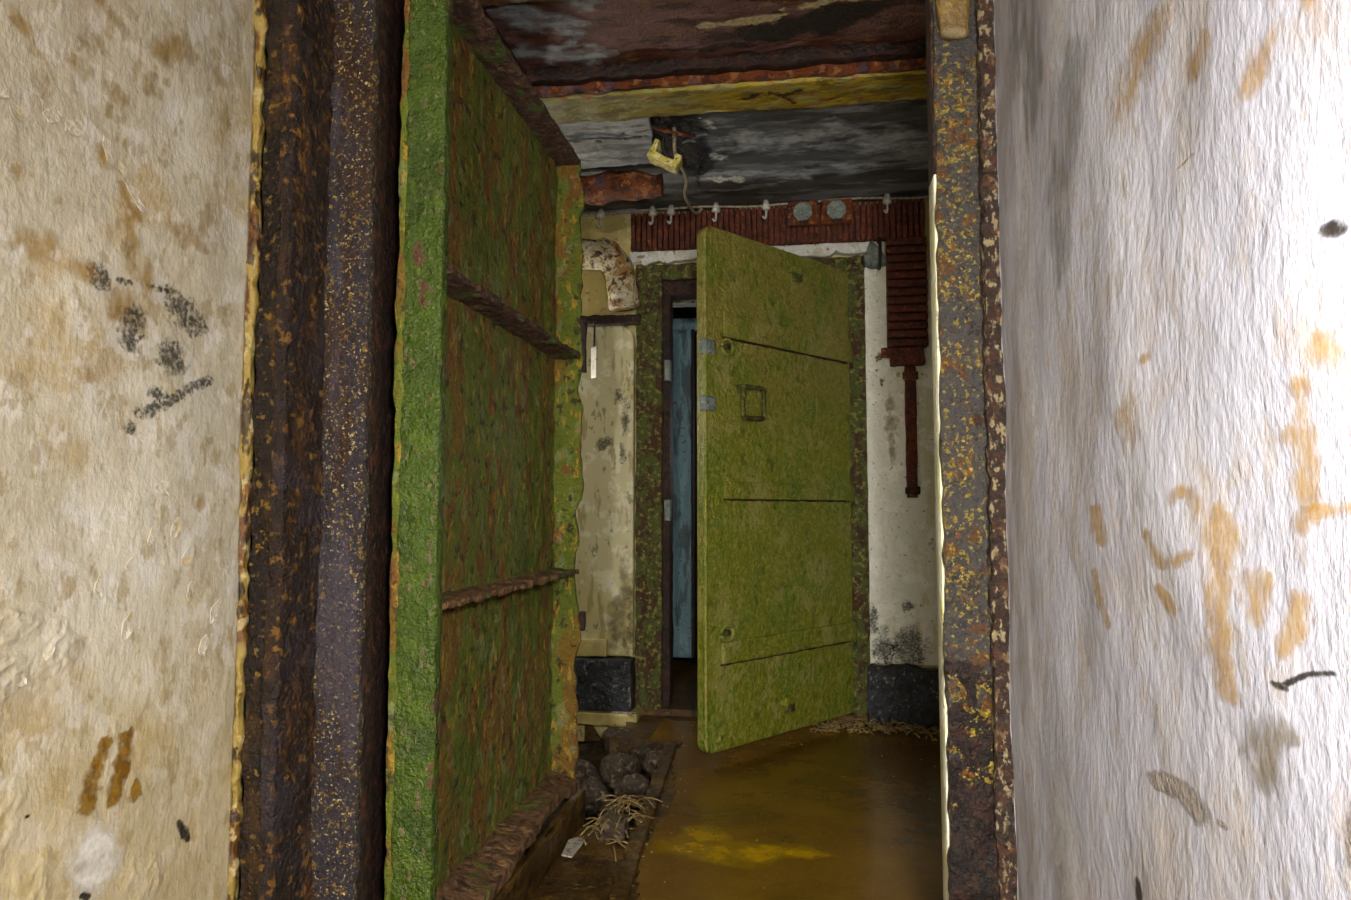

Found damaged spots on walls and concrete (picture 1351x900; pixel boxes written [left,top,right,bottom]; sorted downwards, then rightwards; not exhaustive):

peeling [497,0,608,64]
peeling [697,0,901,52]
spalling [650,115,713,177]
mould [86,263,133,290]
mould [117,304,145,352]
mould [127,284,212,435]
mould [869,606,933,666]
corrosion [80,727,142,815]
corrosion [943,661,1000,900]